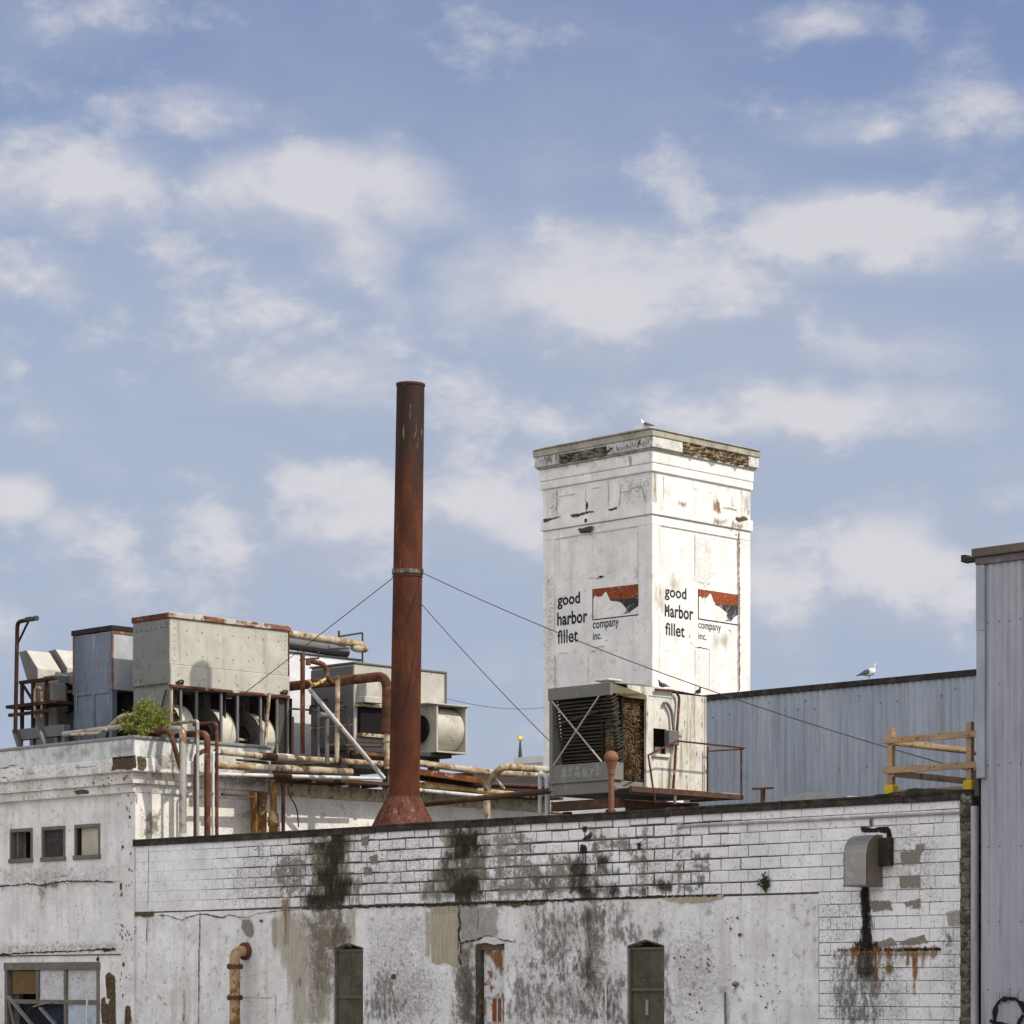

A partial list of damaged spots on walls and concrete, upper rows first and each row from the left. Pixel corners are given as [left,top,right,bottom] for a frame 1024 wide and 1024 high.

spalling [559,447,607,464]
spalling [682,442,750,466]
crack [0,875,114,887]
peeling [899,844,924,909]
damp [272,835,361,1024]
damp [422,825,710,1024]
peeling [101,957,132,1024]
damp [364,963,406,1024]
damp [833,951,893,1024]
rust [837,945,941,995]